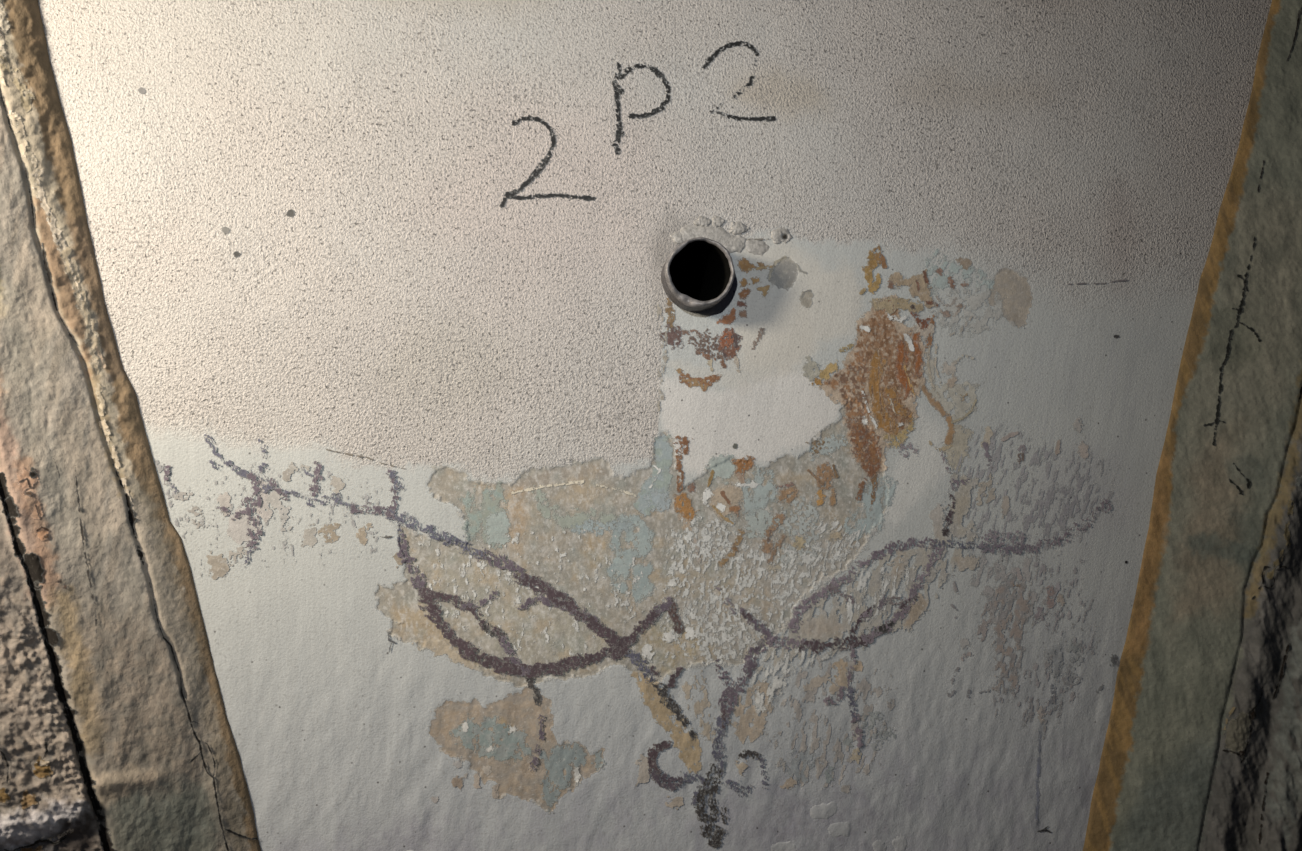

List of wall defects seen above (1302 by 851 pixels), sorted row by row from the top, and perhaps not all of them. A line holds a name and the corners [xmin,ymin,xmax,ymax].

crack [1287,7,1302,61]
corrosion [654,257,774,411]
peeling [767,256,813,308]
corrosion [803,245,938,507]
peeling [987,267,1033,328]
crack [1203,237,1261,495]
crack [0,448,117,851]
crack [113,464,258,851]
peeling [155,460,382,580]
peeling [374,405,1120,814]
crack [1222,642,1290,844]